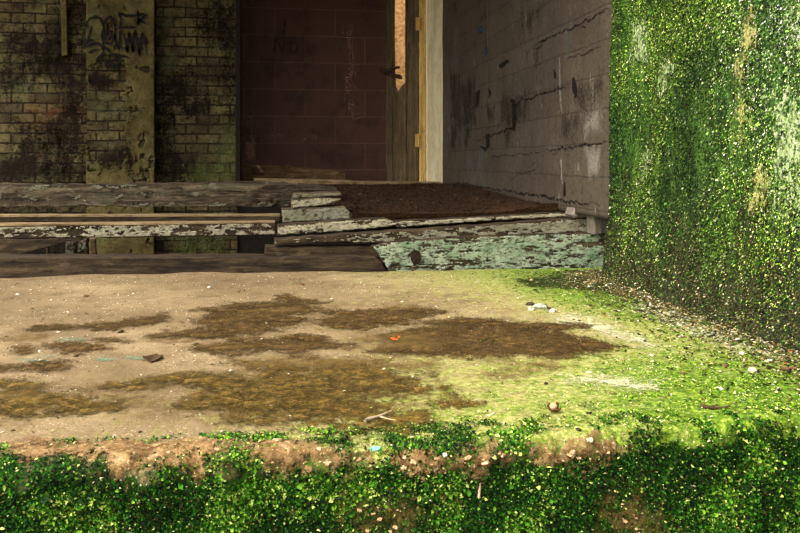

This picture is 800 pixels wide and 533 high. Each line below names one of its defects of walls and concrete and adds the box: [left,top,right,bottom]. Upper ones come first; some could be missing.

crack [527,8,608,55]
damp [0,0,125,184]
damp [156,0,236,183]
crack [450,86,605,206]
peeling [14,185,101,206]
peeling [91,185,161,206]
peeling [0,194,605,271]